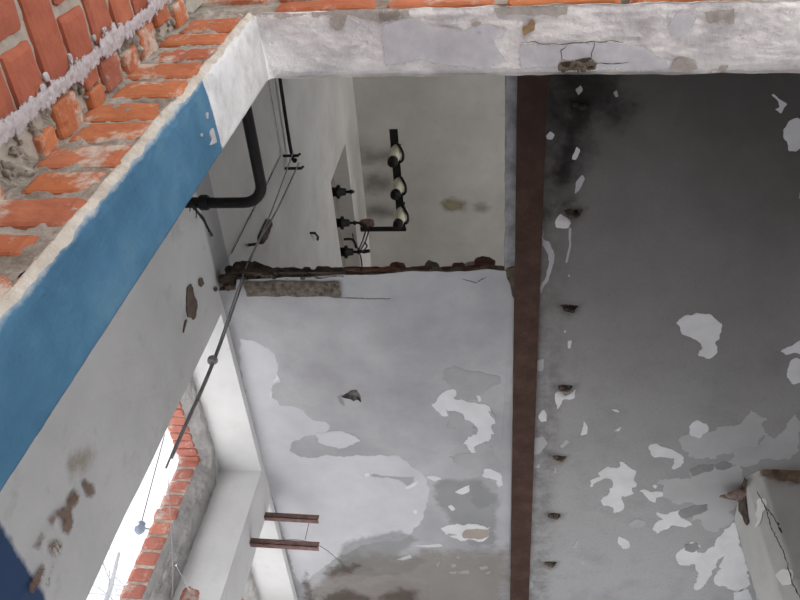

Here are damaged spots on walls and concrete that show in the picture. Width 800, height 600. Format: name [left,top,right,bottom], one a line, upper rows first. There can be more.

crack [520,40,628,64]
peeling [494,5,698,73]
spalling [183,278,204,333]
spalling [214,261,479,297]
peeling [677,313,722,359]
peeling [781,341,800,384]
peeling [555,385,576,409]
peeling [239,339,441,584]
peeling [431,366,503,509]
peeling [441,523,490,542]
peeling [590,410,800,600]
crack [757,492,800,597]